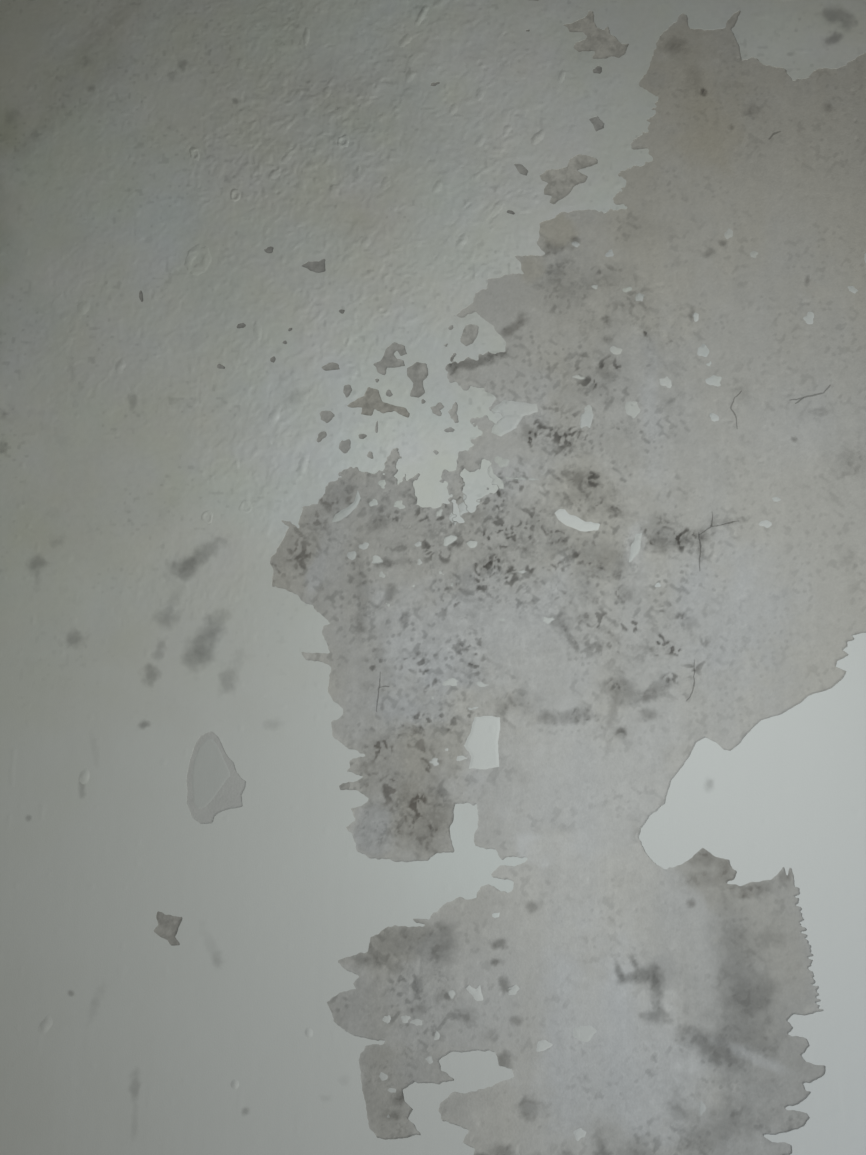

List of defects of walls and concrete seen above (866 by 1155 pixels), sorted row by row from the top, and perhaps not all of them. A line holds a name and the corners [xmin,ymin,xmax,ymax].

peeling [270,11,866,1155]
peeling [186,732,246,824]
peeling [154,911,182,946]